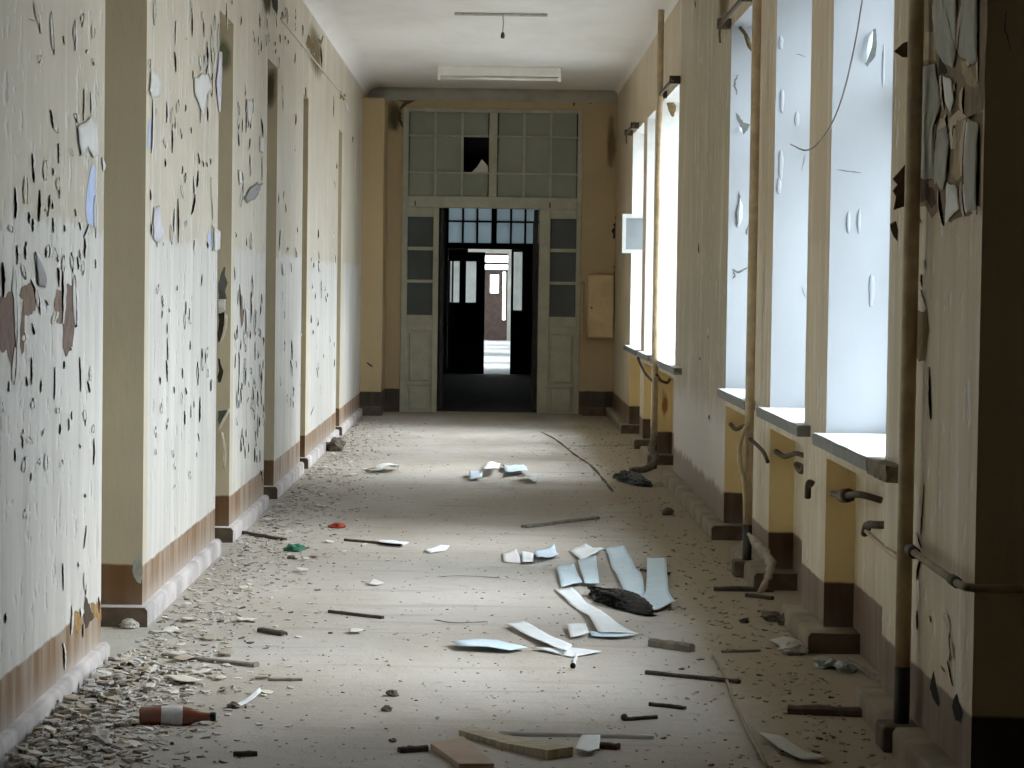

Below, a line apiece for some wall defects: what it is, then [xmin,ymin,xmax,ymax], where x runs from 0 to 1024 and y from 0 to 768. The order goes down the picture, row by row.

peeling [29,2,97,66]
peeling [148,0,233,167]
peeling [238,86,264,205]
peeling [241,0,323,74]
spalling [894,41,908,57]
peeling [920,0,987,226]
peeling [150,153,221,252]
spalling [890,165,905,242]
spalling [0,89,106,465]
peeling [280,316,319,408]
peeling [14,429,65,481]
spalling [930,671,963,723]